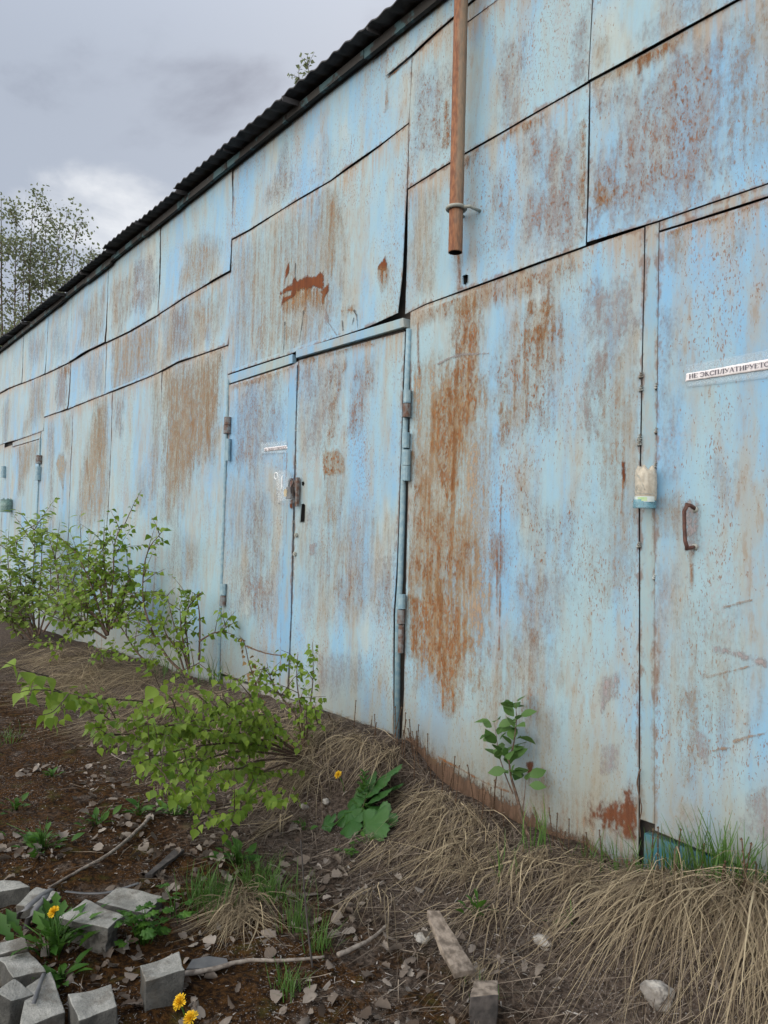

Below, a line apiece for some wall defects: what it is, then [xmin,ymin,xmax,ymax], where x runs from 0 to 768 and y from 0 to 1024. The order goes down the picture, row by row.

rust [604,35,683,77]
rust [239,197,352,355]
rust [378,257,387,288]
rust [112,305,221,518]
rust [322,361,373,521]
rust [407,257,582,719]
rust [560,789,637,854]